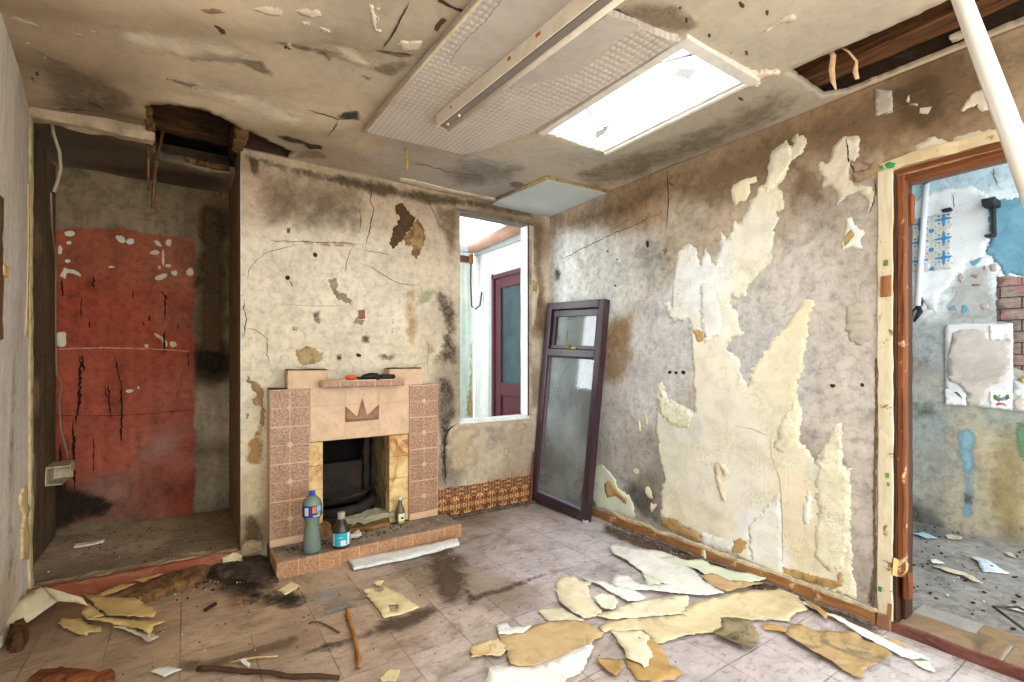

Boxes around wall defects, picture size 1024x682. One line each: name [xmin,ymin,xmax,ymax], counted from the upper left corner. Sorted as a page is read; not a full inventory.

leakage [580,104,771,181]
leakage [250,158,542,251]
spalling [389,203,426,259]
peeling [842,217,865,250]
crack [243,180,420,365]
leakage [438,292,456,360]
peeling [693,283,722,344]
crack [55,347,190,416]
spalling [246,376,265,412]
leakage [440,379,455,474]
peeling [604,480,627,504]
peeling [645,486,844,589]